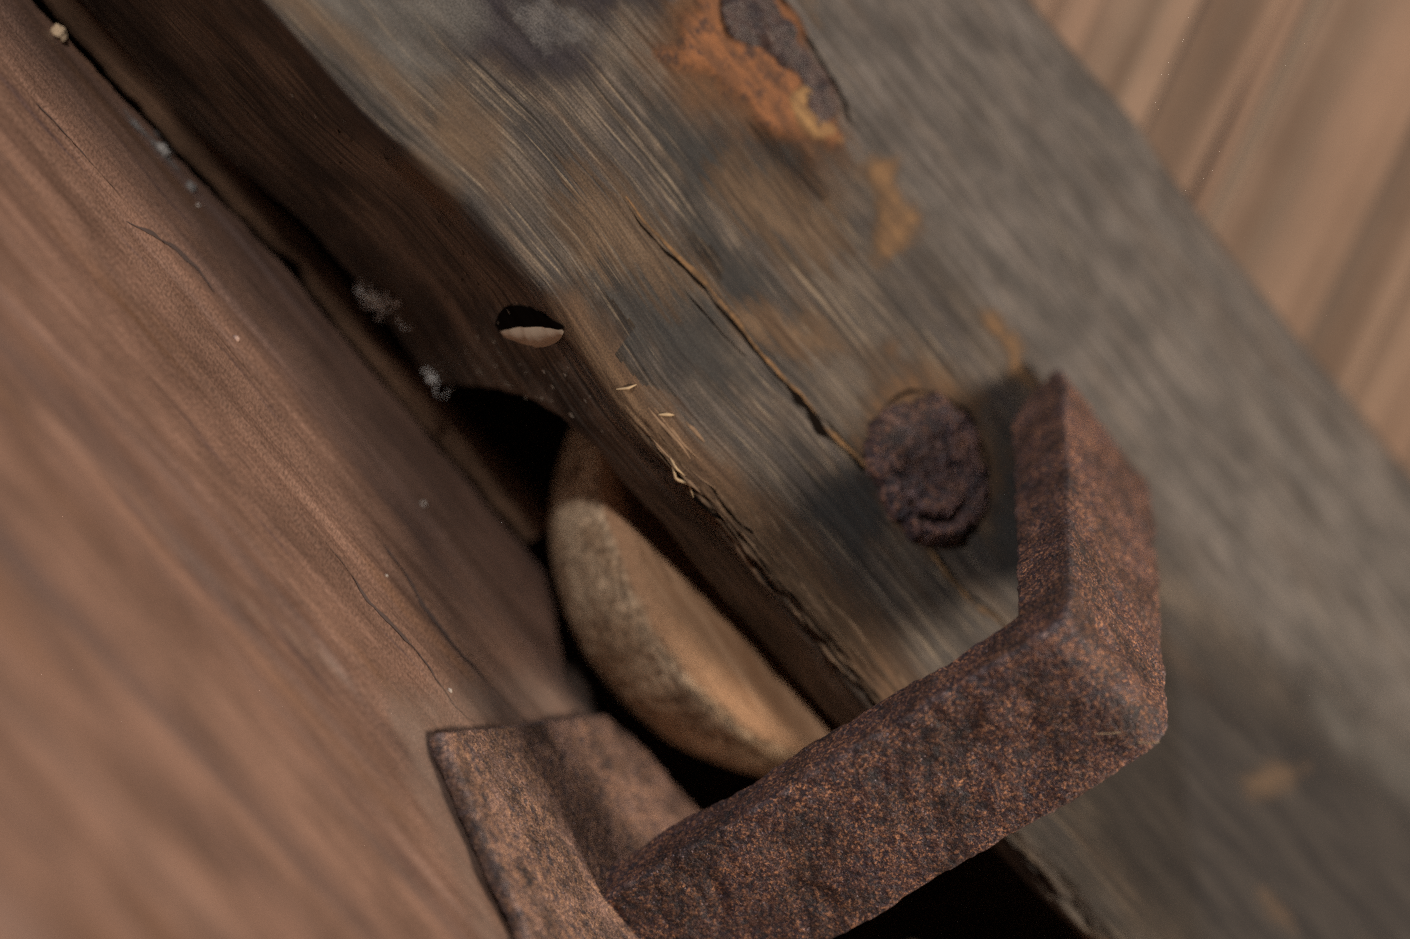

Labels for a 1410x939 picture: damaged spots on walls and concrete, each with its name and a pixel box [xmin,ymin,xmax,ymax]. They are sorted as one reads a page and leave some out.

corrosion [656,0,852,219]
crack [625,196,867,472]